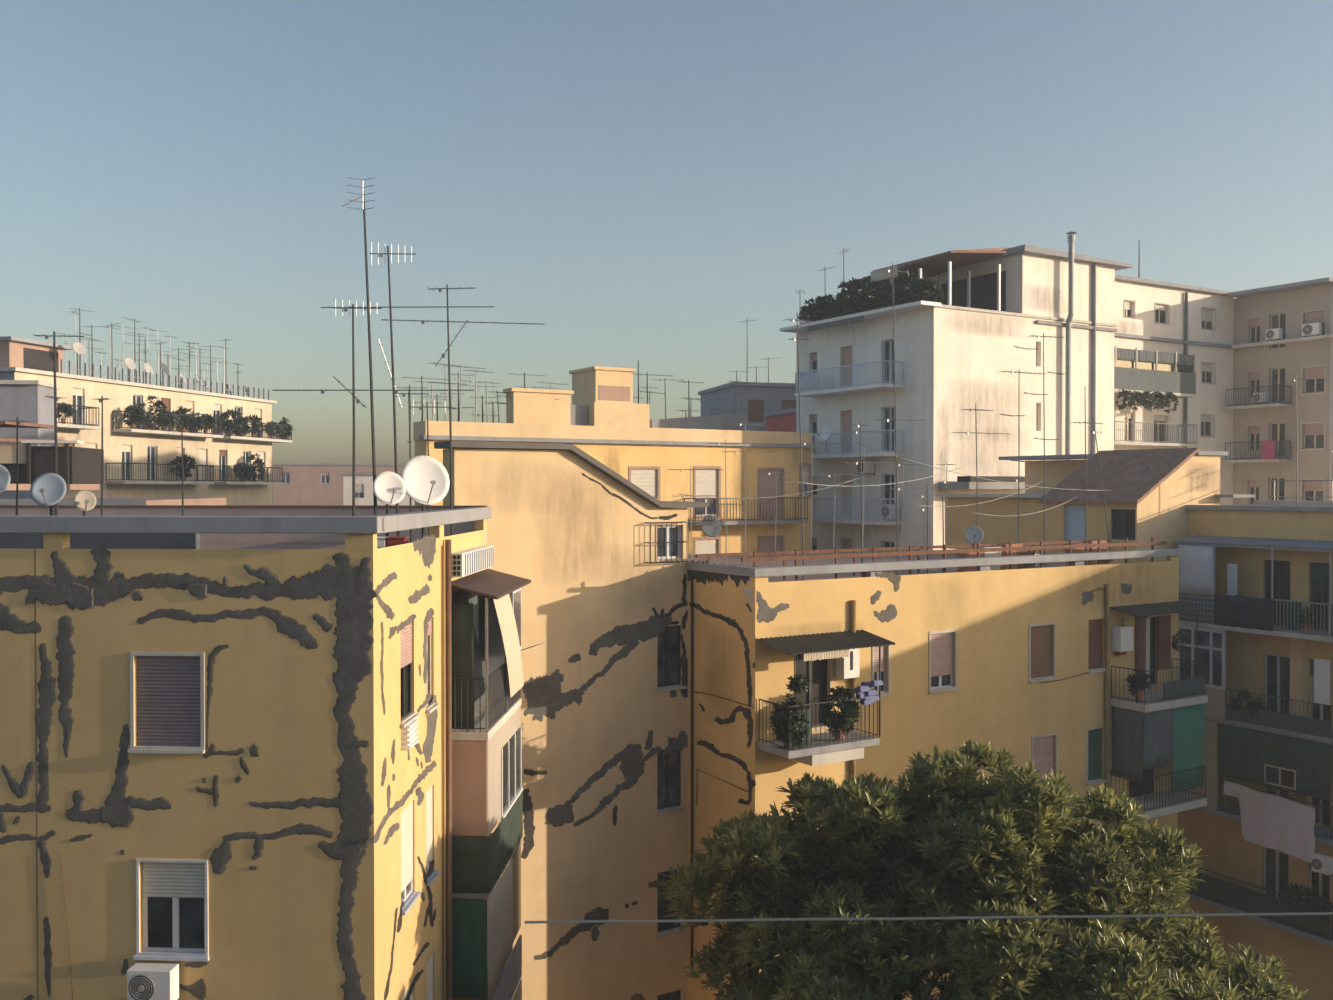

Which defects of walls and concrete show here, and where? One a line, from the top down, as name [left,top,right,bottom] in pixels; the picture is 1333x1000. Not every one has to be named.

crack [582,473,678,520]